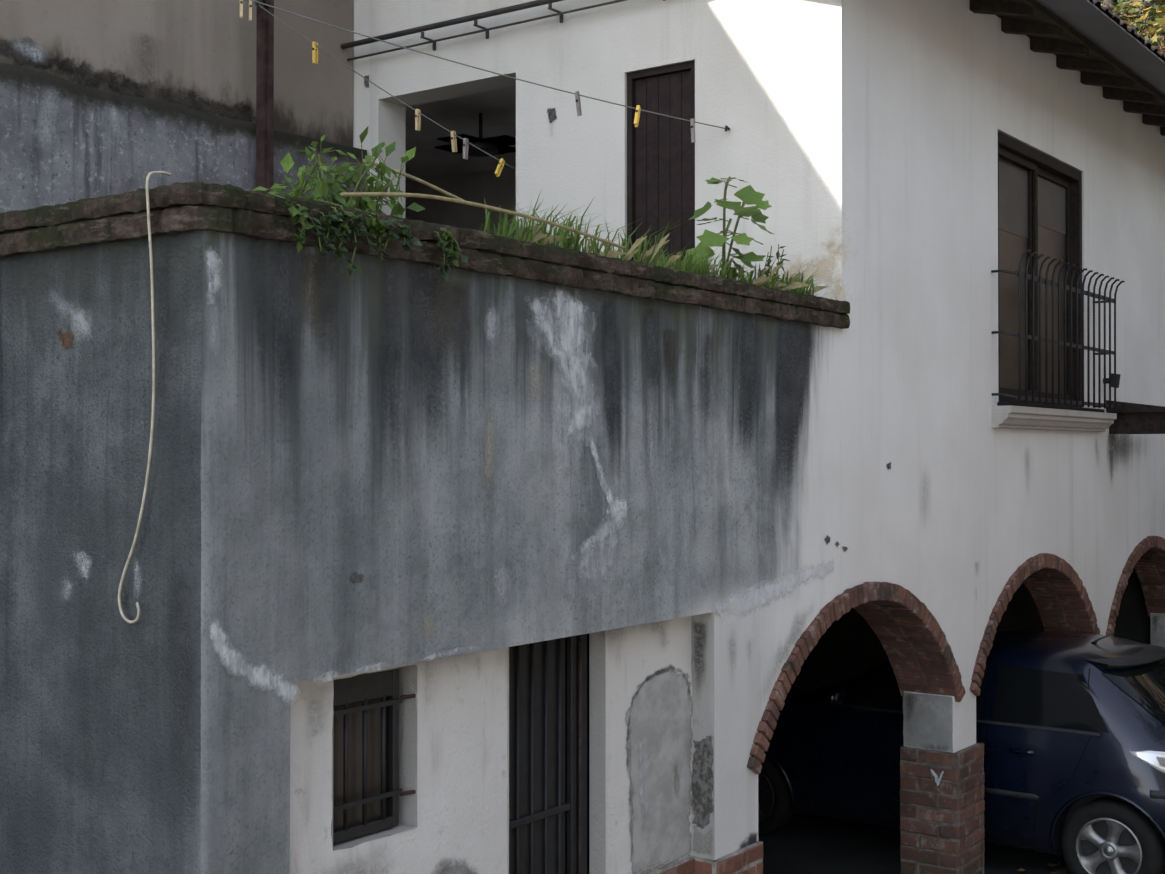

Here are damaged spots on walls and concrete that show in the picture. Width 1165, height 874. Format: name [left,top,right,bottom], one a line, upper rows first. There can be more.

damp [0,39,256,122]
damp [207,251,220,291]
damp [383,258,467,431]
damp [487,312,496,338]
damp [603,302,621,441]
damp [737,315,758,441]
damp [776,320,812,474]
flaking render [694,624,705,675]
flaking render [674,736,714,853]